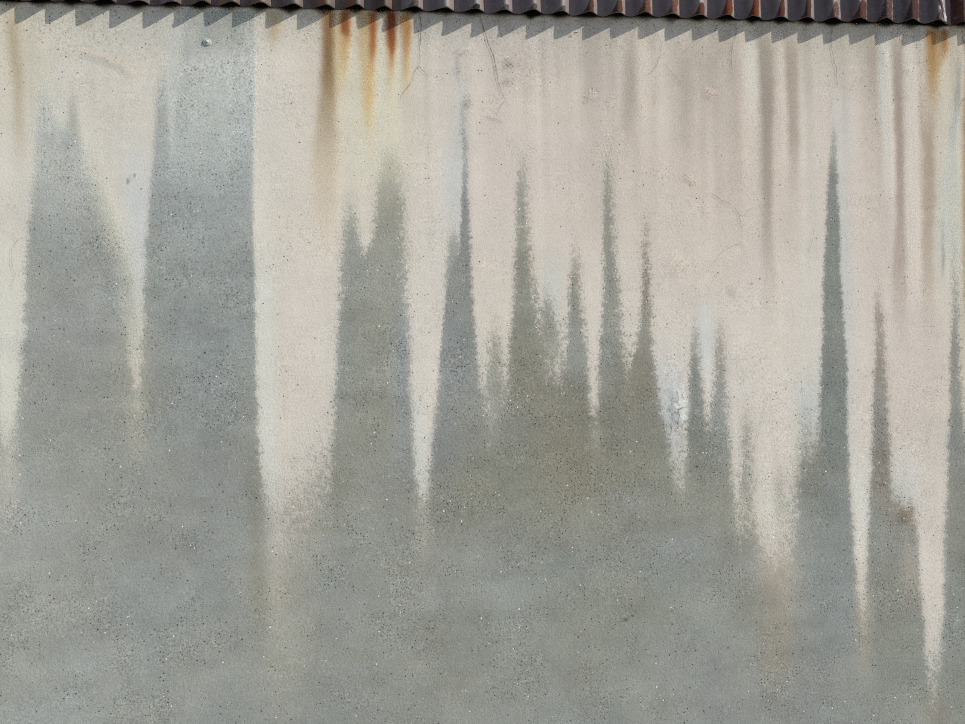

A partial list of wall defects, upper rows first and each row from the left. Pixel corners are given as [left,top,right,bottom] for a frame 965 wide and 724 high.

rust [317,12,349,187]
rust [361,0,419,106]
rust [851,0,919,21]
leakage [740,425,759,489]